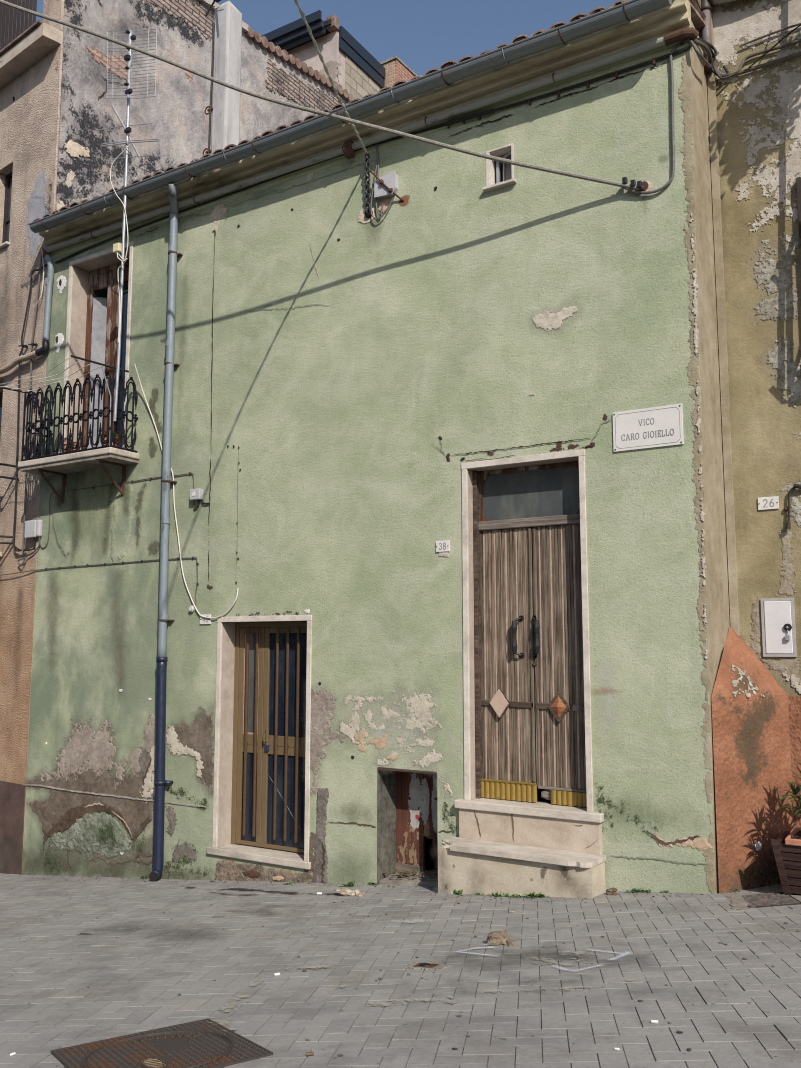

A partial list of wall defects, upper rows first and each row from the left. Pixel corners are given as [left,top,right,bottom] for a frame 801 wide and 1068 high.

flaking render [146,0,214,41]
crack [448,60,670,137]
flaking render [63,140,90,188]
peeling [712,0,801,321]
crack [188,157,388,584]
peeling [533,306,578,331]
peeling [650,381,715,894]
flaking render [25,698,198,865]
flaking render [174,713,214,795]
flaking render [310,681,444,796]
leakage [736,669,776,787]
crack [575,825,714,866]